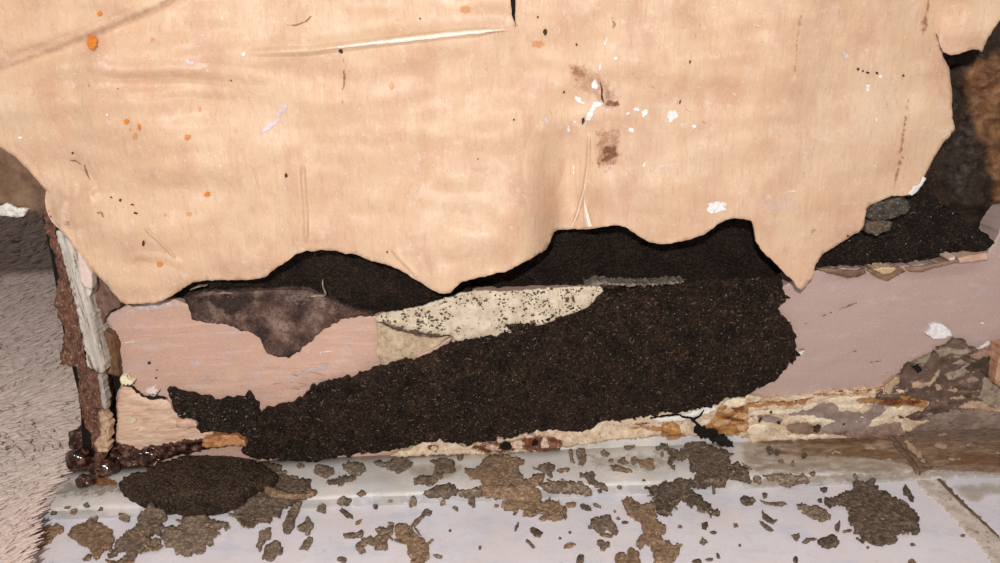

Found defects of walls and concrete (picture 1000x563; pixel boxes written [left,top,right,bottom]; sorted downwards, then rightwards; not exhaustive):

spalling [815,251,989,281]
peeling [115,383,214,450]
flaking render [326,335,1000,499]